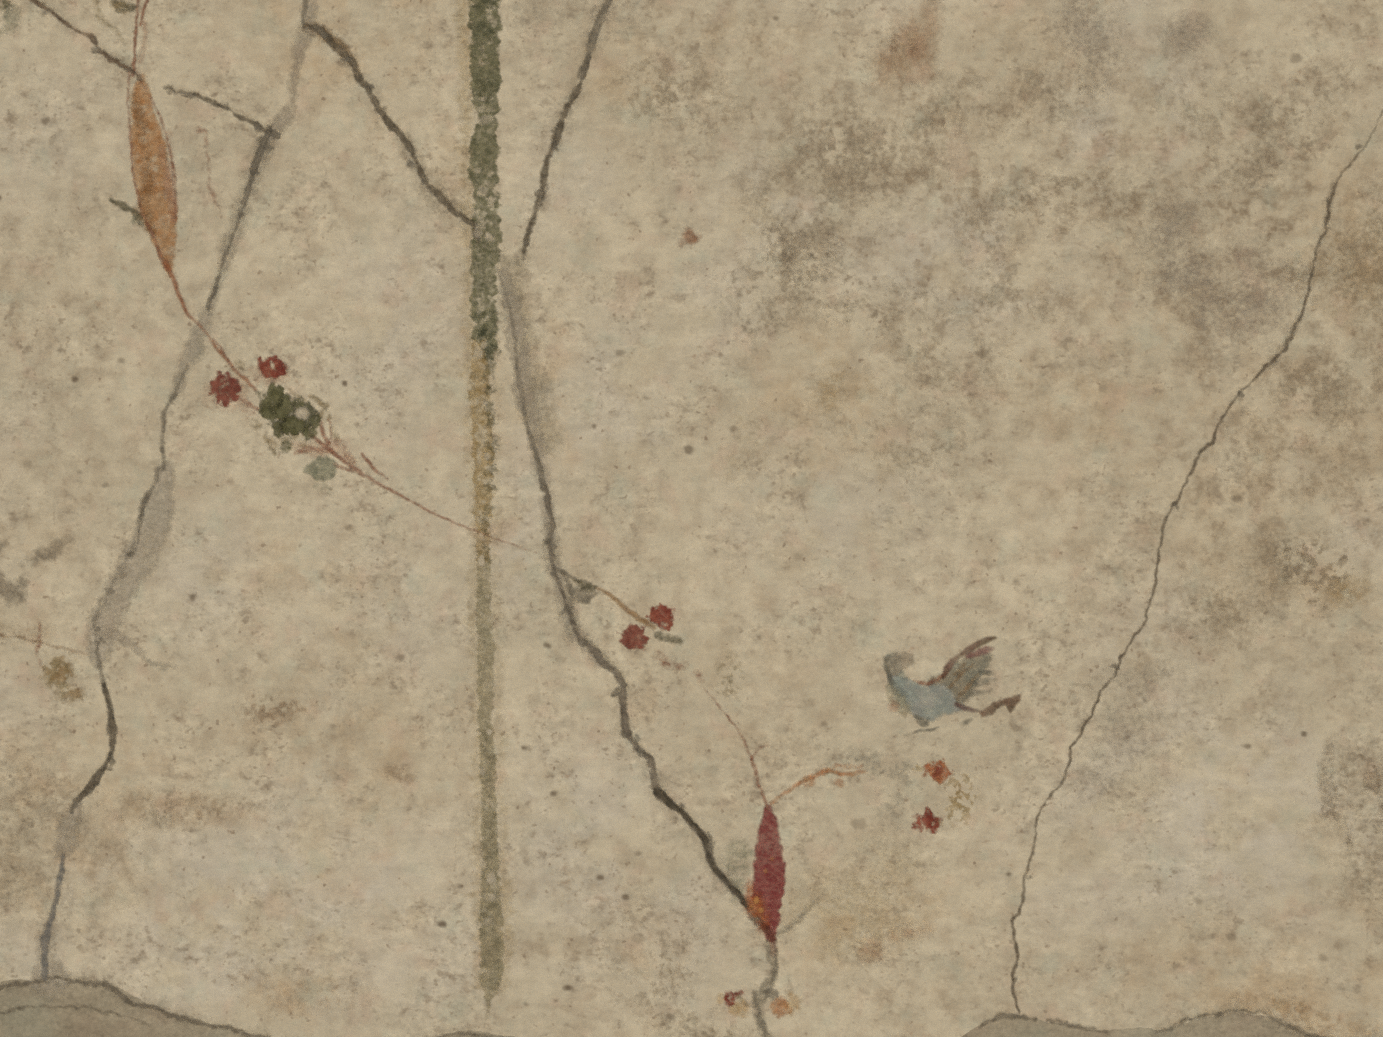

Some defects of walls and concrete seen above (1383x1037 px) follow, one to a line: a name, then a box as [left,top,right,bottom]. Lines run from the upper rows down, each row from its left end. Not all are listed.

crack [0,0,480,1037]
crack [500,4,766,932]
crack [981,144,1361,1030]